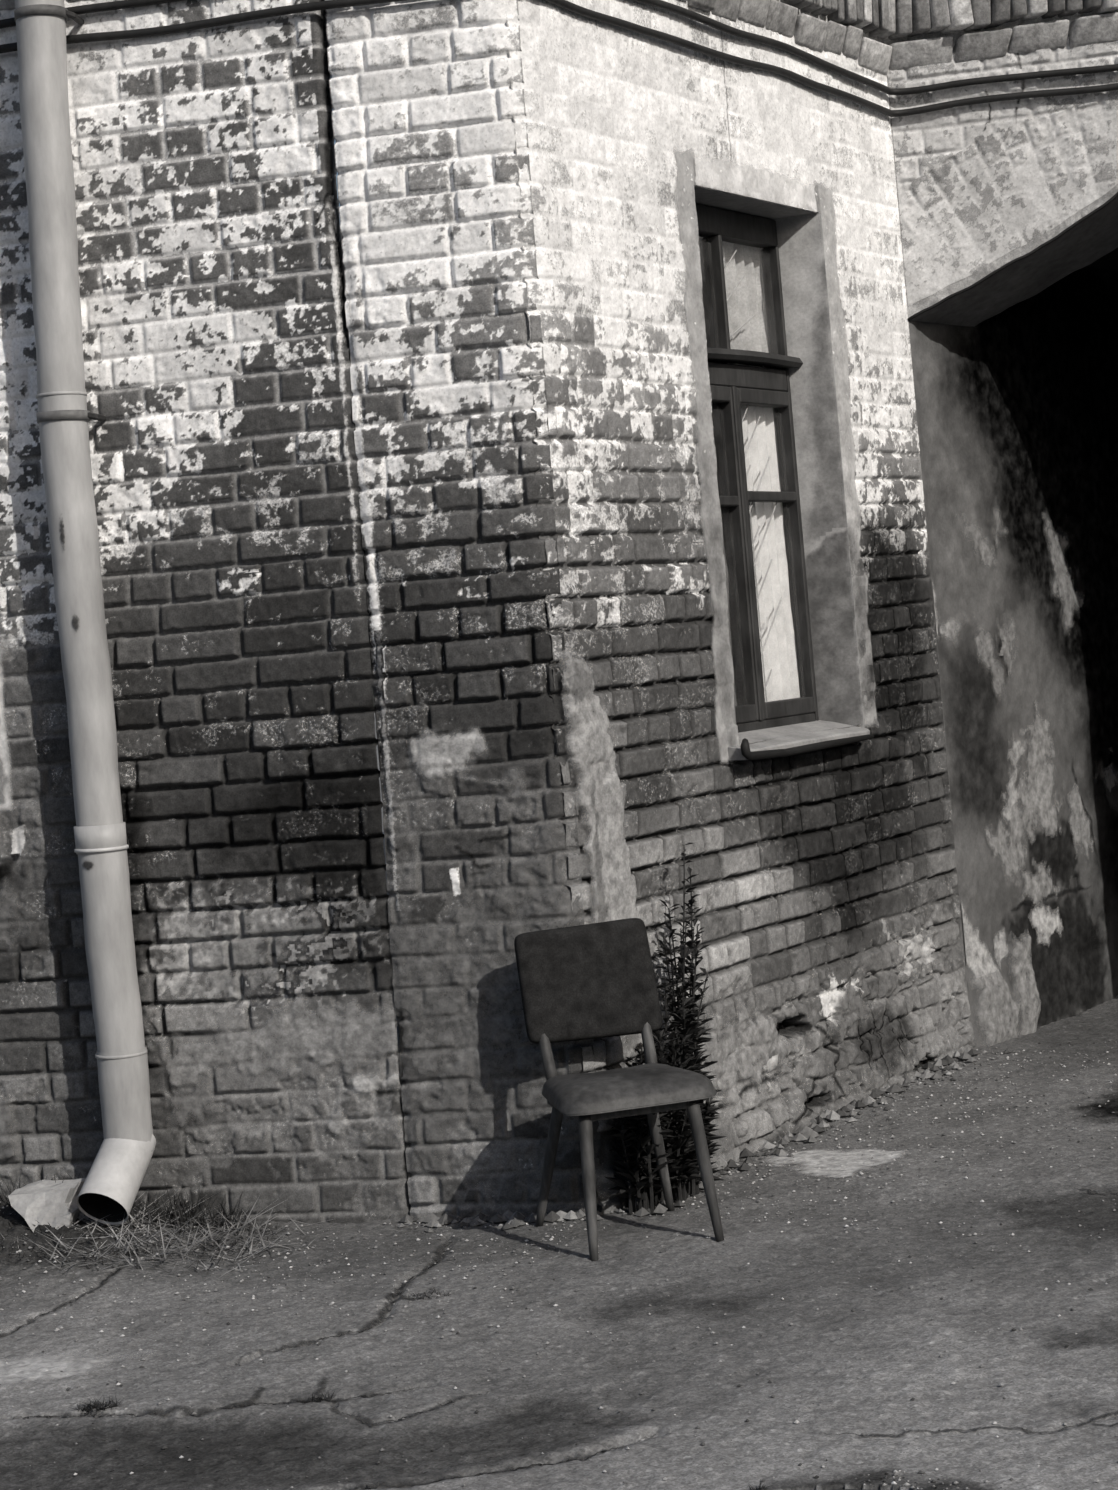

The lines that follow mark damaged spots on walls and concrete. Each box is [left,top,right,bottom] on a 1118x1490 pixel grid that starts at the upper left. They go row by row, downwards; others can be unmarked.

peeling [64,0,1118,697]
peeling [986,702,1093,943]
peeling [961,904,1008,981]
damp [1011,826,1104,1025]
crack [0,1264,124,1337]
crack [255,1241,448,1352]
crack [14,1378,473,1426]
crack [836,1412,1118,1437]